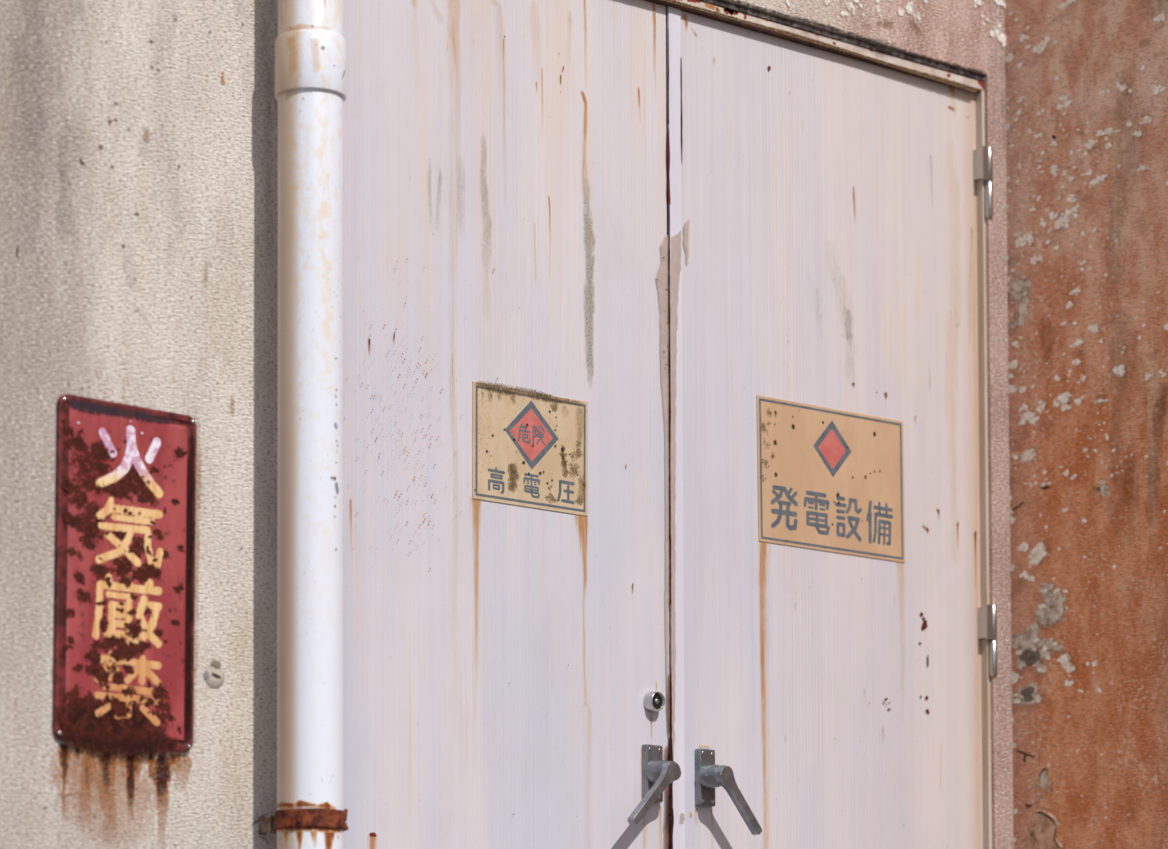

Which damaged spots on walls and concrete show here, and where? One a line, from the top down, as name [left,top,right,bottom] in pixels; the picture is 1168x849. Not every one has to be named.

leakage [584,213,594,375]
spalling [1007,268,1031,328]
leakage [656,219,690,761]
rust [578,515,597,587]
spalling [1011,583,1069,705]
rust [58,744,191,814]
rust [277,800,349,849]
peeling [1029,809,1063,849]